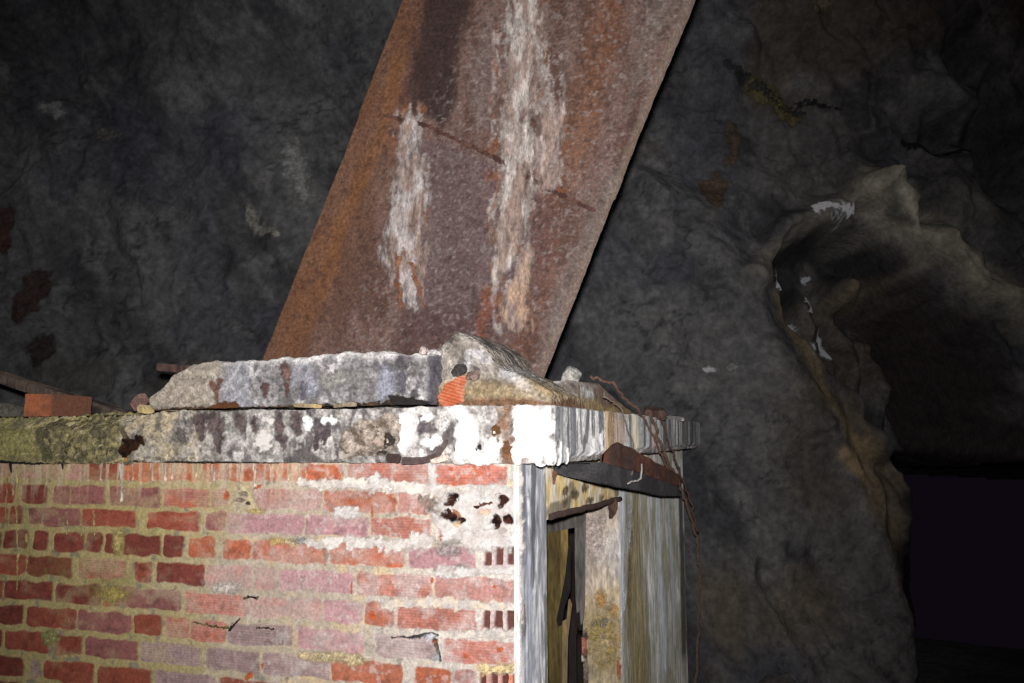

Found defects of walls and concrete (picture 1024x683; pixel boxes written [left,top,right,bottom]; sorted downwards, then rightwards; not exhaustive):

damp [487,0,567,332]
damp [378,113,431,310]
corrosion [393,248,425,309]
damp [269,405,604,683]
spalling [440,493,466,528]
spalling [474,493,513,534]
crack [193,595,274,631]
crack [391,632,442,662]